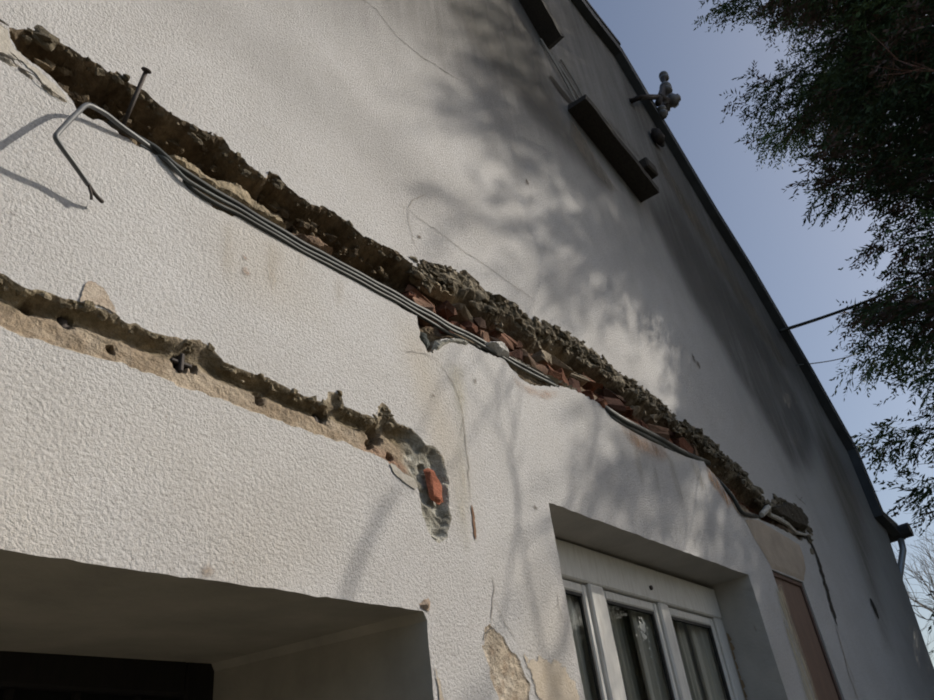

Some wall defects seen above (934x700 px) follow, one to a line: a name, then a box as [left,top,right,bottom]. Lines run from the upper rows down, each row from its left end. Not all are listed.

spalling [0,25,159,146]
spalling [38,281,195,353]
spalling [170,112,803,524]
peeling [482,624,579,700]
crack [799,531,859,700]